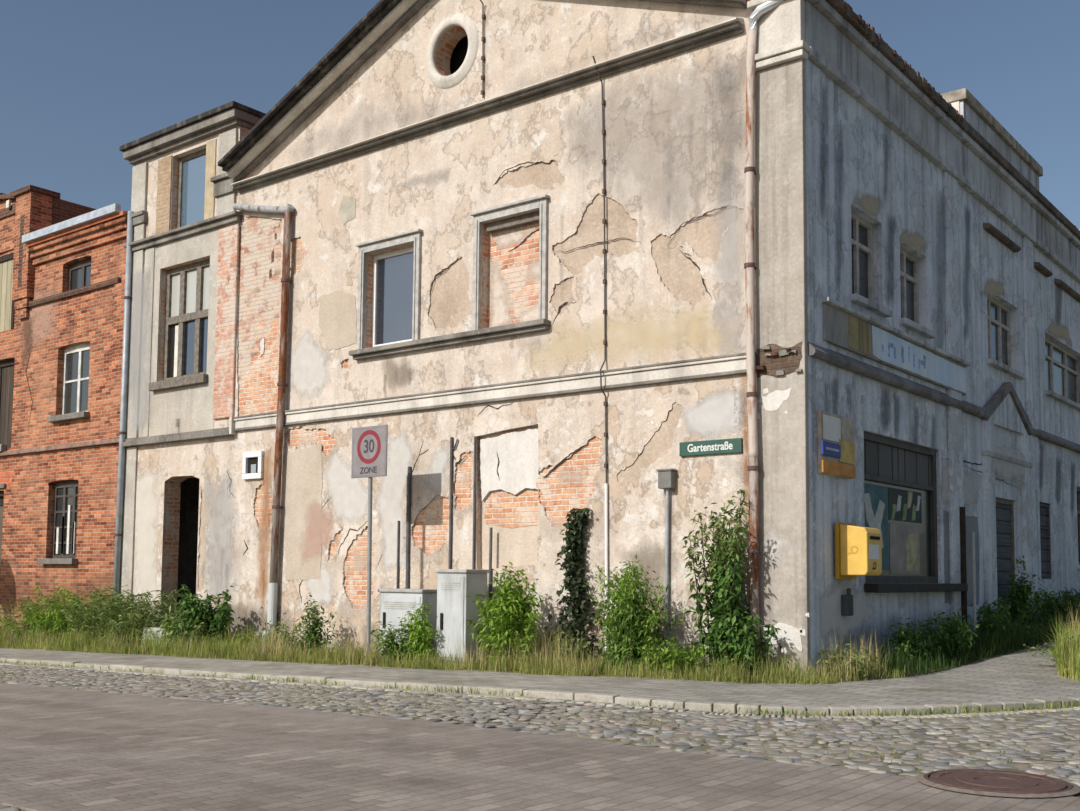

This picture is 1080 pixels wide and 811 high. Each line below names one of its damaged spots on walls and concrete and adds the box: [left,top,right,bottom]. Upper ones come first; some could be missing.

spalling [494,157,565,189]
spalling [238,215,328,416]
spalling [429,258,472,331]
spalling [550,194,639,315]
spalling [652,205,745,304]
spalling [248,458,273,534]
spalling [285,425,602,614]